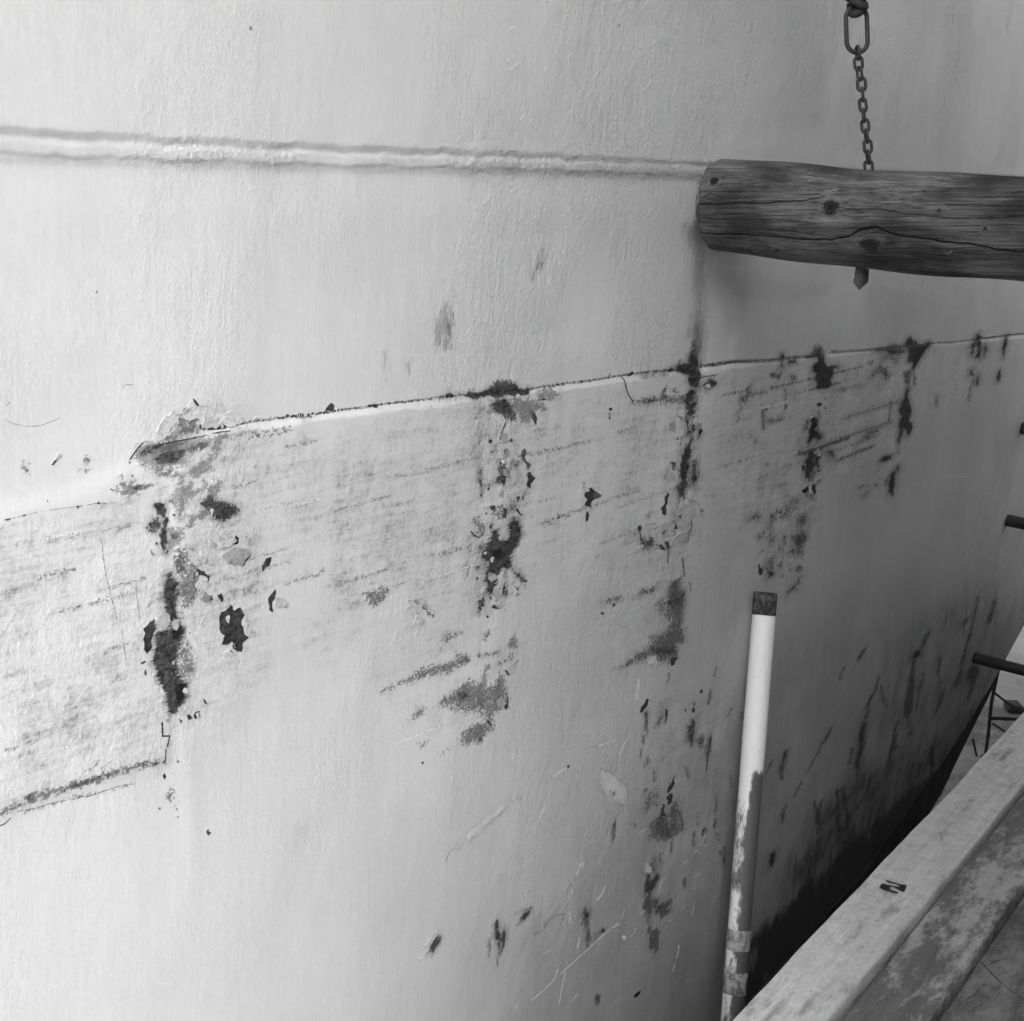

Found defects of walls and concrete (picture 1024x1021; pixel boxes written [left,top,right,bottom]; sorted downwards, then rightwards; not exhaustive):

peeling [157,399,272,442]
leakage [722,361,891,467]
peeling [476,432,535,519]
peeling [582,481,602,521]
peeling [210,535,252,566]
leakage [636,578,684,616]
peeling [141,619,156,675]
peeling [219,605,256,662]
leakage [614,632,678,670]
peeling [178,699,208,723]
leakage [461,720,495,746]